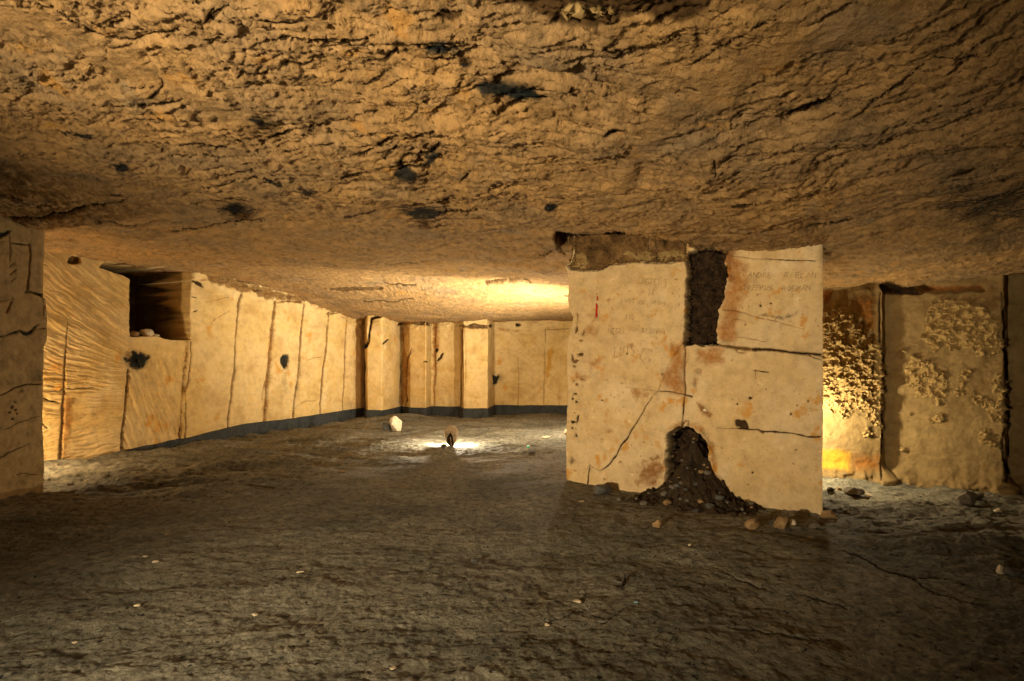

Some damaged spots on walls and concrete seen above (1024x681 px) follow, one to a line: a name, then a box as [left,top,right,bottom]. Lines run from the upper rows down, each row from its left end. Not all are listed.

crack [0,320,93,475]
crack [587,346,684,484]
crack [723,420,821,438]